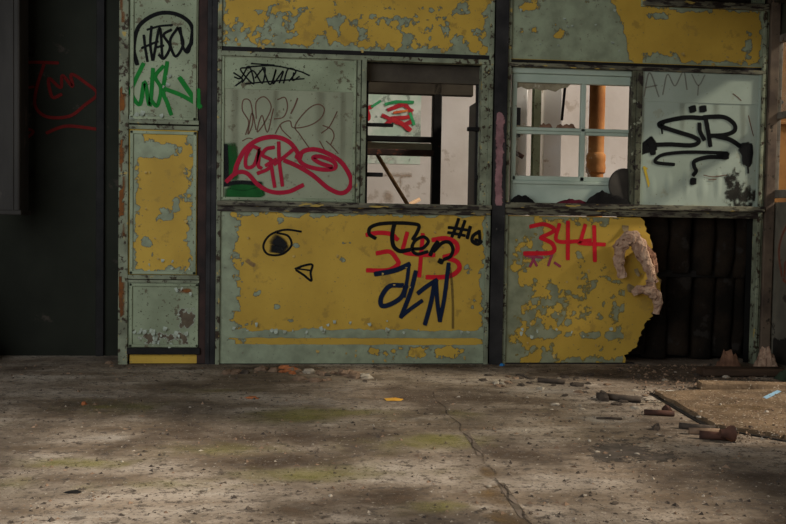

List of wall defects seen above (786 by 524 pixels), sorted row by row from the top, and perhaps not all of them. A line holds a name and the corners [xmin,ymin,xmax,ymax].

peeling [222,0,490,55]
peeling [512,0,763,67]
peeling [133,134,193,271]
peeling [219,211,486,363]
peeling [505,216,650,363]
crack [433,392,532,524]